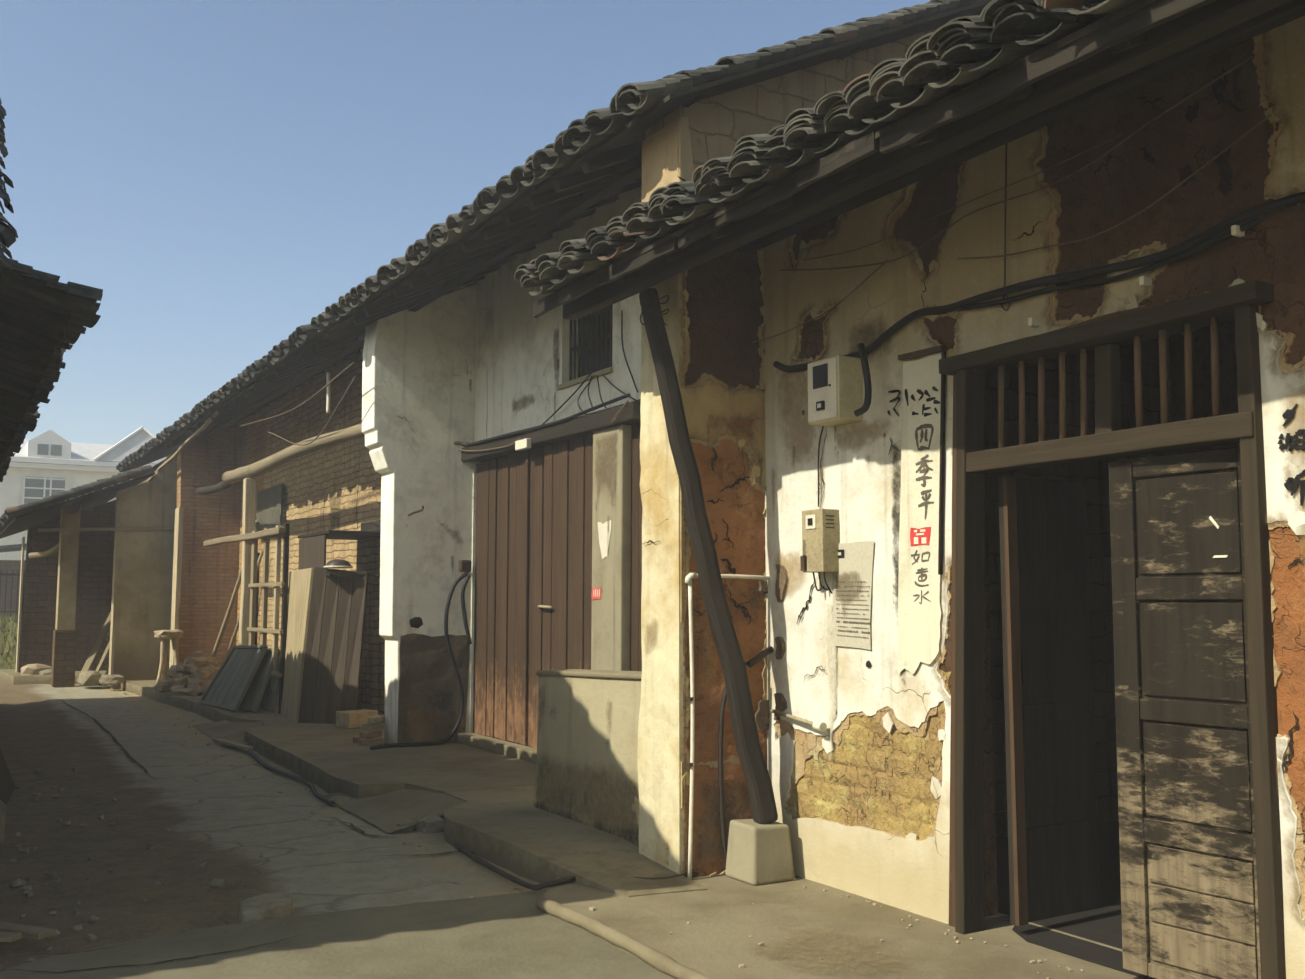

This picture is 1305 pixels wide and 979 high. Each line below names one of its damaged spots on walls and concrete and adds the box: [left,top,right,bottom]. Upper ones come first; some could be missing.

spalling [1035,126,1105,324]
spalling [1108,241,1169,310]
spalling [1256,305,1305,372]
damp [1289,393,1305,459]
crack [693,446,751,624]
spalling [1268,511,1305,687]
spalling [681,522,726,878]
peeling [822,736,834,754]
peeling [883,712,894,733]
crack [1282,711,1298,773]
peeling [930,776,942,800]
spalling [1277,734,1305,919]